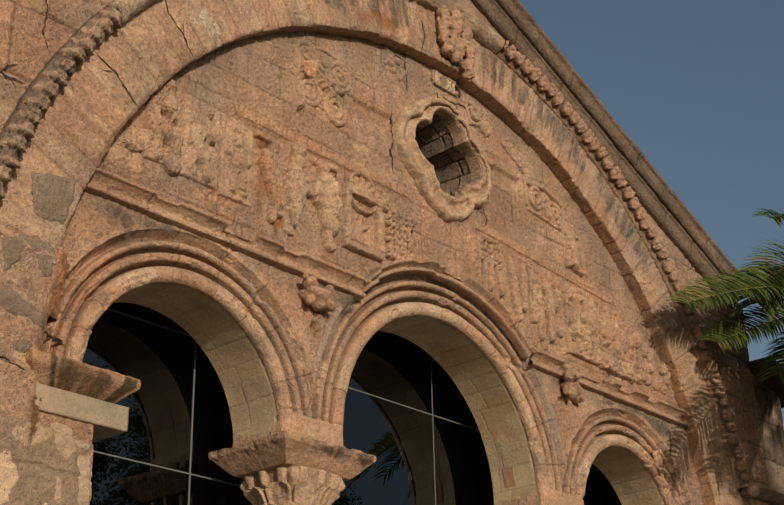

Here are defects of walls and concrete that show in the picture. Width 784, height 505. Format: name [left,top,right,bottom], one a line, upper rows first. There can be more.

crack [42,0,57,52]
crack [97,54,138,105]